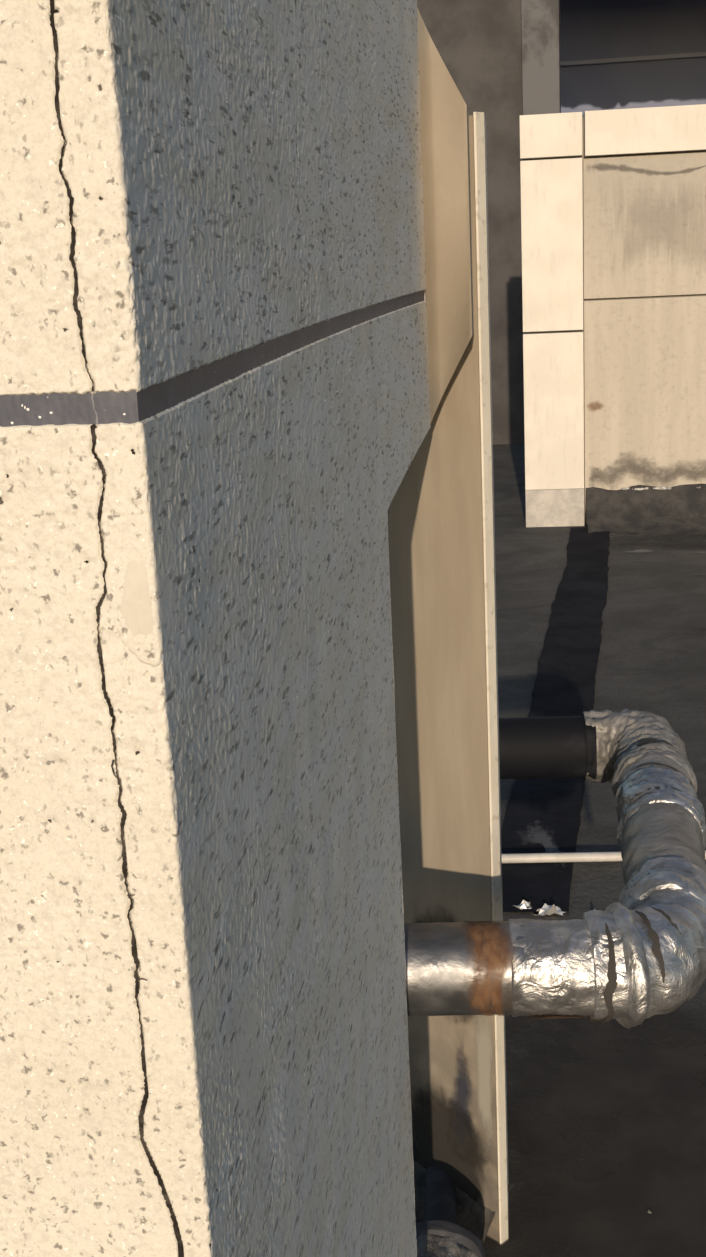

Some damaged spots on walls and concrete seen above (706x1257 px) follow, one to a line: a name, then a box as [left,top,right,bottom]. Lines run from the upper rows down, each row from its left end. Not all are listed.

crack [50,0,184,1257]
leakage [591,461,706,483]